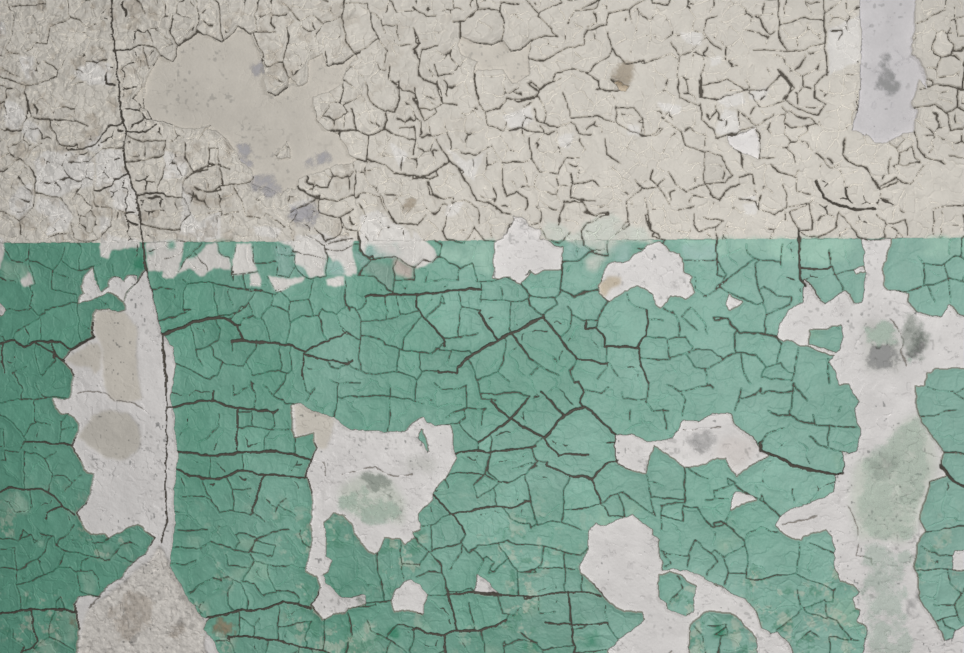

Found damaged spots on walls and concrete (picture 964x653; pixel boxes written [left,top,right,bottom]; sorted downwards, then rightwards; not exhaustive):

crack [0,0,413,545]
peeling [0,0,964,359]
crack [786,228,833,299]
crack [815,180,894,223]
peeling [0,239,861,653]
crack [424,487,530,535]
crack [364,286,652,504]
peeling [400,239,964,653]
crack [748,434,873,565]
crack [929,460,964,491]
crack [199,591,330,653]
crack [411,583,608,653]